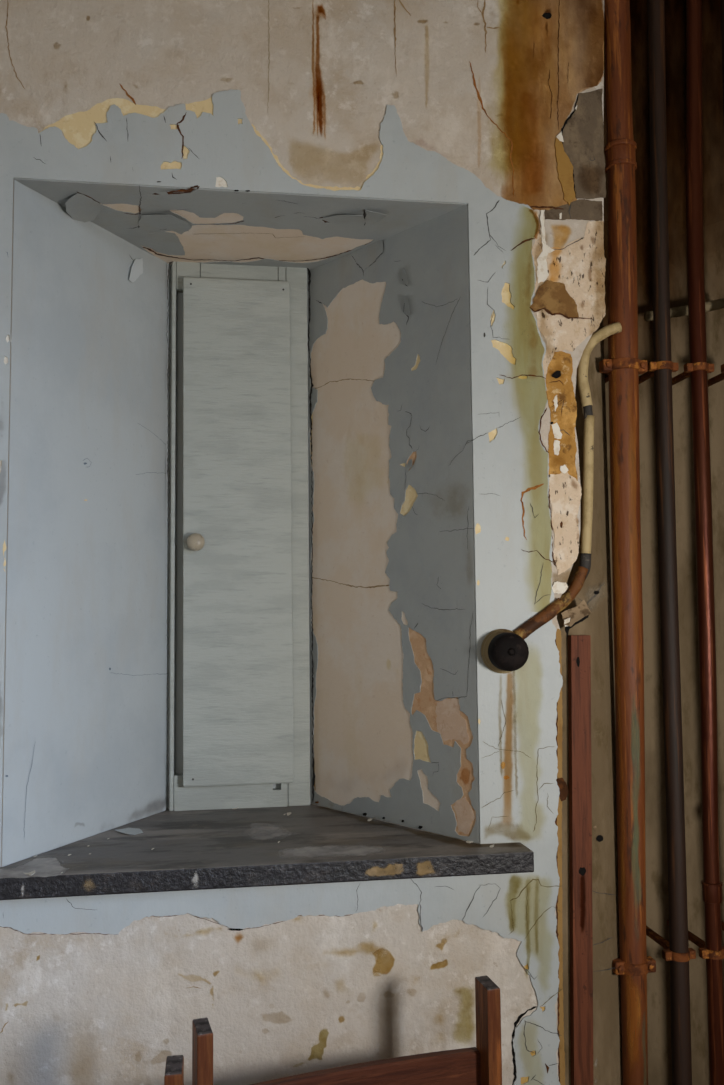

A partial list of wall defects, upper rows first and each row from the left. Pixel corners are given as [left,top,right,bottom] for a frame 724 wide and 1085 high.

rust [316,6,325,133]
crack [394,0,411,76]
crack [469,0,535,339]
crack [352,210,459,359]
crack [451,408,549,462]
peeling [0,89,606,1085]
crack [483,700,555,832]
crack [411,879,561,937]
crack [511,966,564,1085]